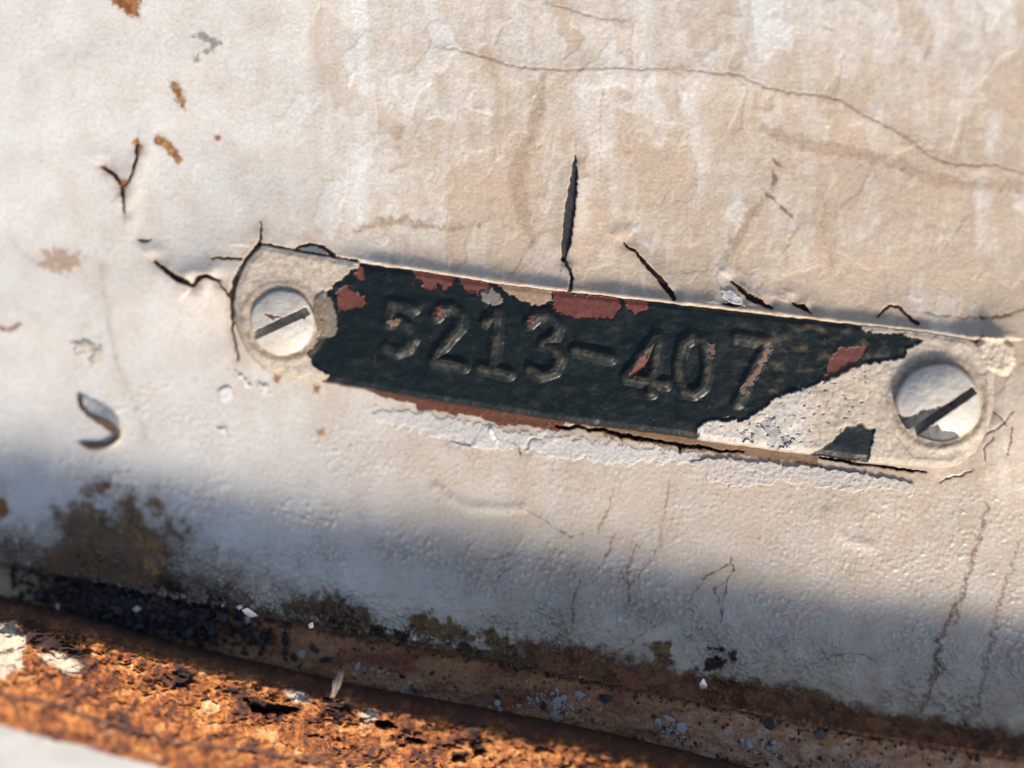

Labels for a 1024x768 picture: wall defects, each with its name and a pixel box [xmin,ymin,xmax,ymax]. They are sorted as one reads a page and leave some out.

corrosion [170,82,186,108]
crack [103,144,139,213]
corrosion [133,136,182,164]
crack [561,155,578,292]
crack [138,221,357,360]
crack [624,243,676,301]
crack [723,281,812,314]
peeling [76,395,122,450]
spalling [367,390,915,498]
corrosion [0,481,1024,768]